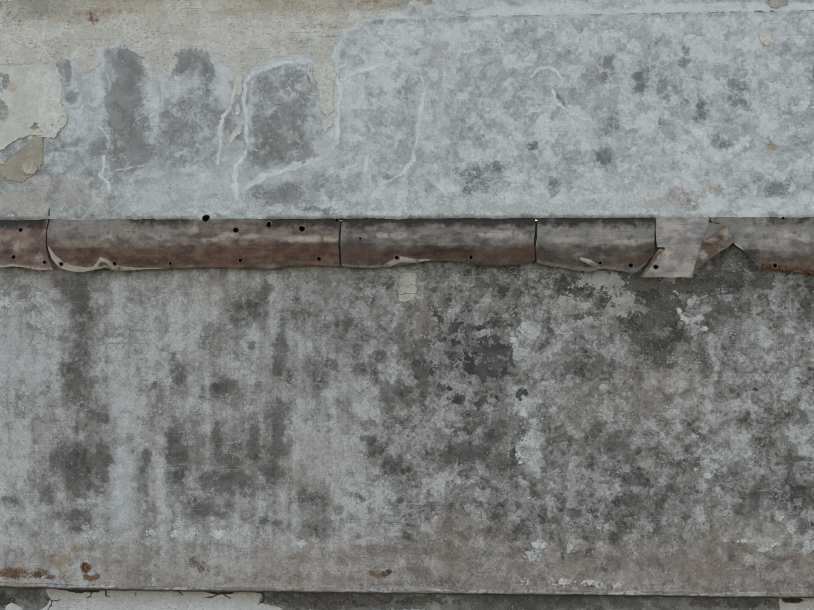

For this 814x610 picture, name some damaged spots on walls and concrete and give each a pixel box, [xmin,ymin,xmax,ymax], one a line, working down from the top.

peeling [765,0,788,9]
peeling [0,0,433,182]
damp [508,322,528,364]
damp [551,268,776,369]
damp [50,413,135,523]
damp [192,423,252,519]
damp [248,398,288,485]
damp [440,402,556,472]
corrosion [0,566,66,580]
corrosion [78,559,100,581]
peeling [0,588,461,610]
spalling [690,598,814,610]